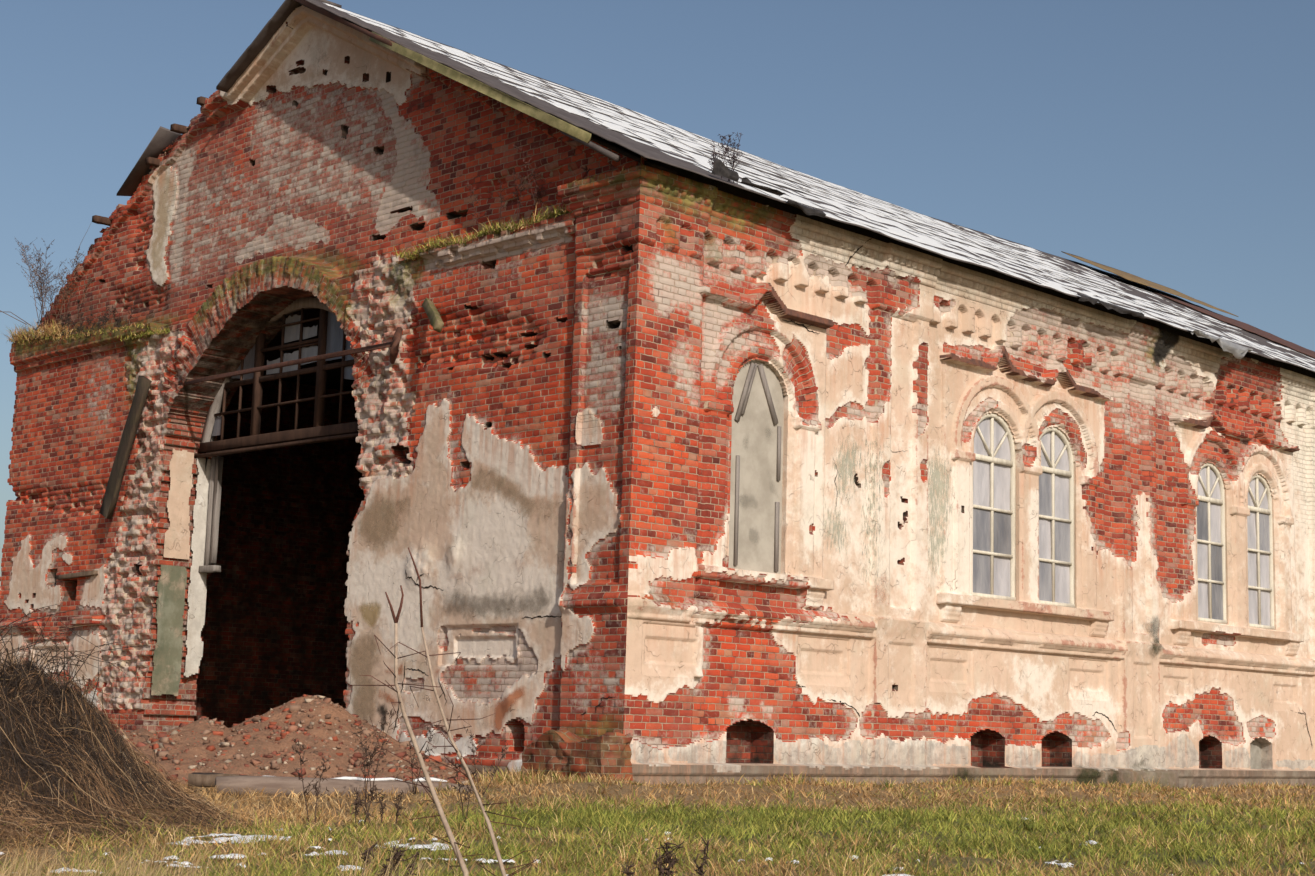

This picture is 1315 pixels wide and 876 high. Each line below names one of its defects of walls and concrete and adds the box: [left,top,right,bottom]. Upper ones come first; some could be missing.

spalling [0,330,211,710]
peeling [99,165,178,314]
peeling [234,7,1298,774]